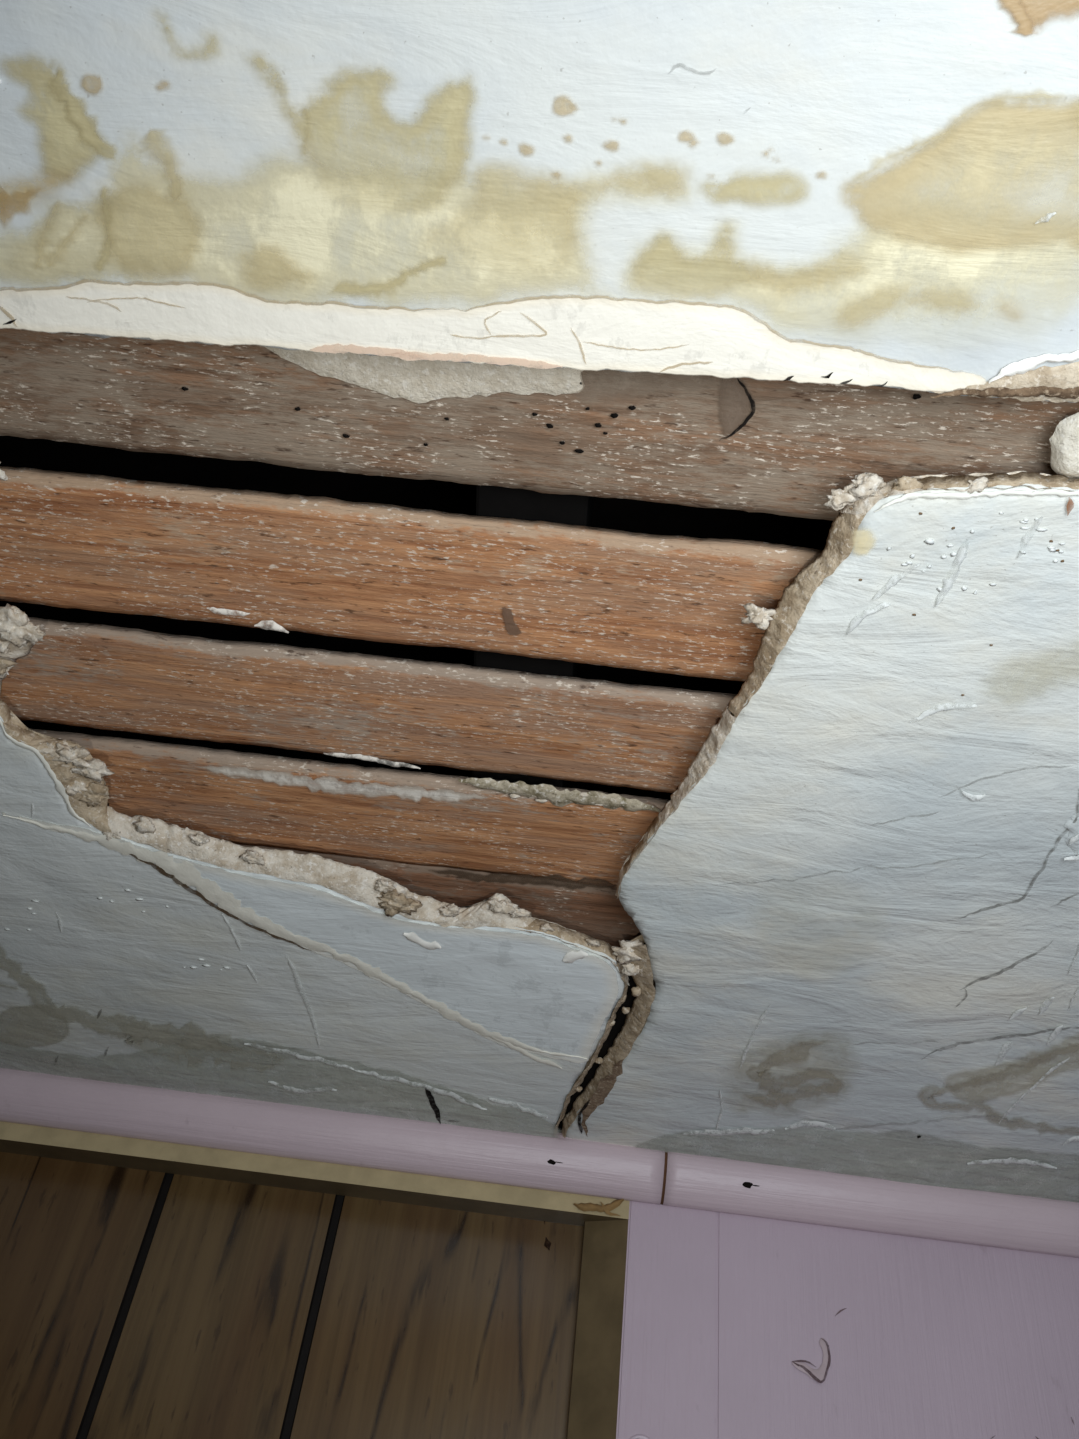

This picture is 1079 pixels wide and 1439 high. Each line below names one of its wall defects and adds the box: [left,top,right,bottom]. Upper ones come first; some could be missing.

water stain [0,61,592,303]
water stain [628,96,1079,323]
peeling [0,279,1079,899]
water stain [0,948,558,1138]
peeling [0,710,645,1069]
crack [555,934,655,1138]
crack [957,954,1037,1006]
crack [921,1027,1079,1060]
crack [960,805,1079,919]